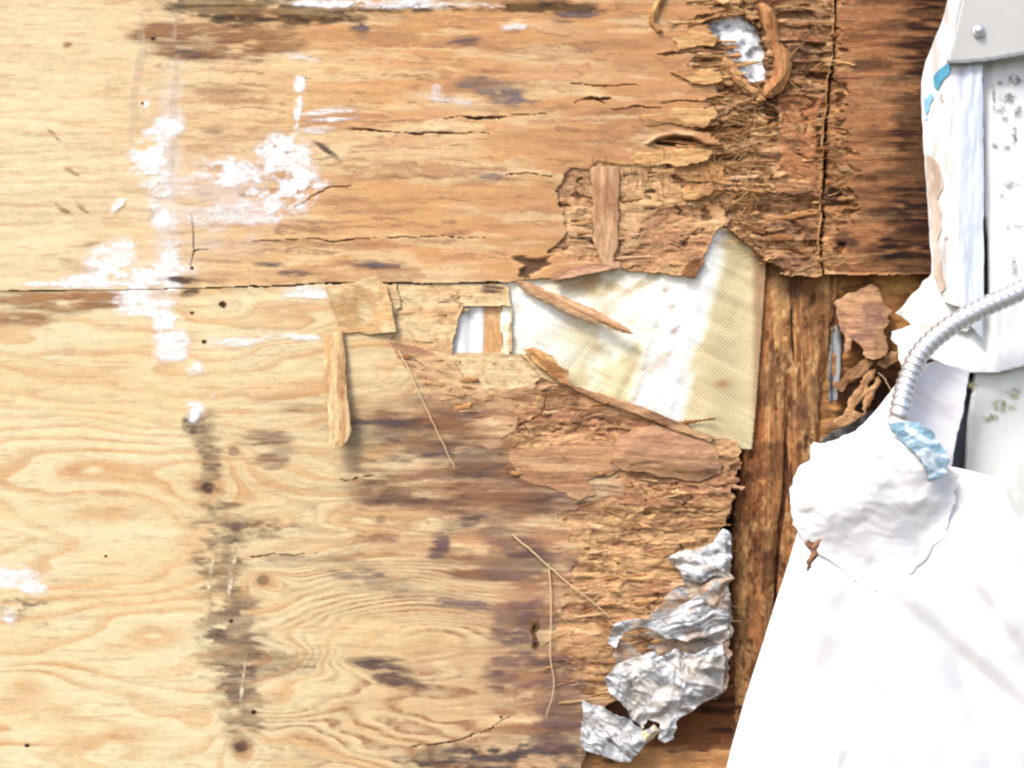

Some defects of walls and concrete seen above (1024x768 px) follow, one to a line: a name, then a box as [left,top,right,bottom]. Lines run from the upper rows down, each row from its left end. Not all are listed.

damp [195,76,351,222]
crack [348,114,547,136]
peeling [548,116,868,275]
peeling [686,40,765,98]
damp [871,89,931,274]
damp [897,0,947,76]
damp [0,240,202,371]
peeling [389,282,559,421]
damp [350,410,568,580]
peeling [658,489,707,509]
peeling [587,550,708,604]
damp [418,707,586,768]